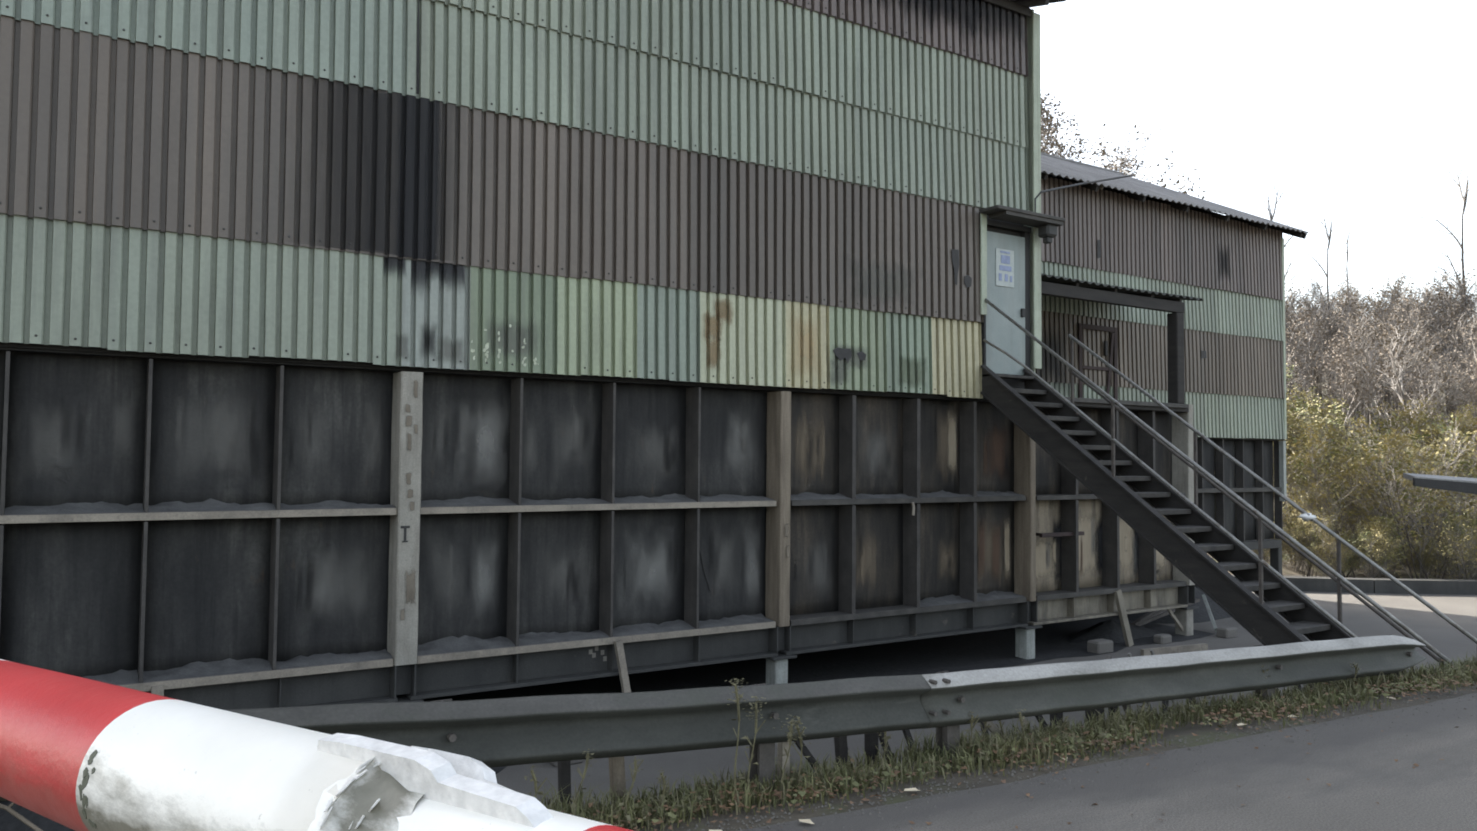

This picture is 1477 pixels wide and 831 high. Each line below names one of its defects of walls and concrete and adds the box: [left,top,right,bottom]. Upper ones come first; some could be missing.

damp [367,92,465,283]
damp [424,331,434,350]
corrosion [706,302,730,364]
corrosion [979,524,1010,574]